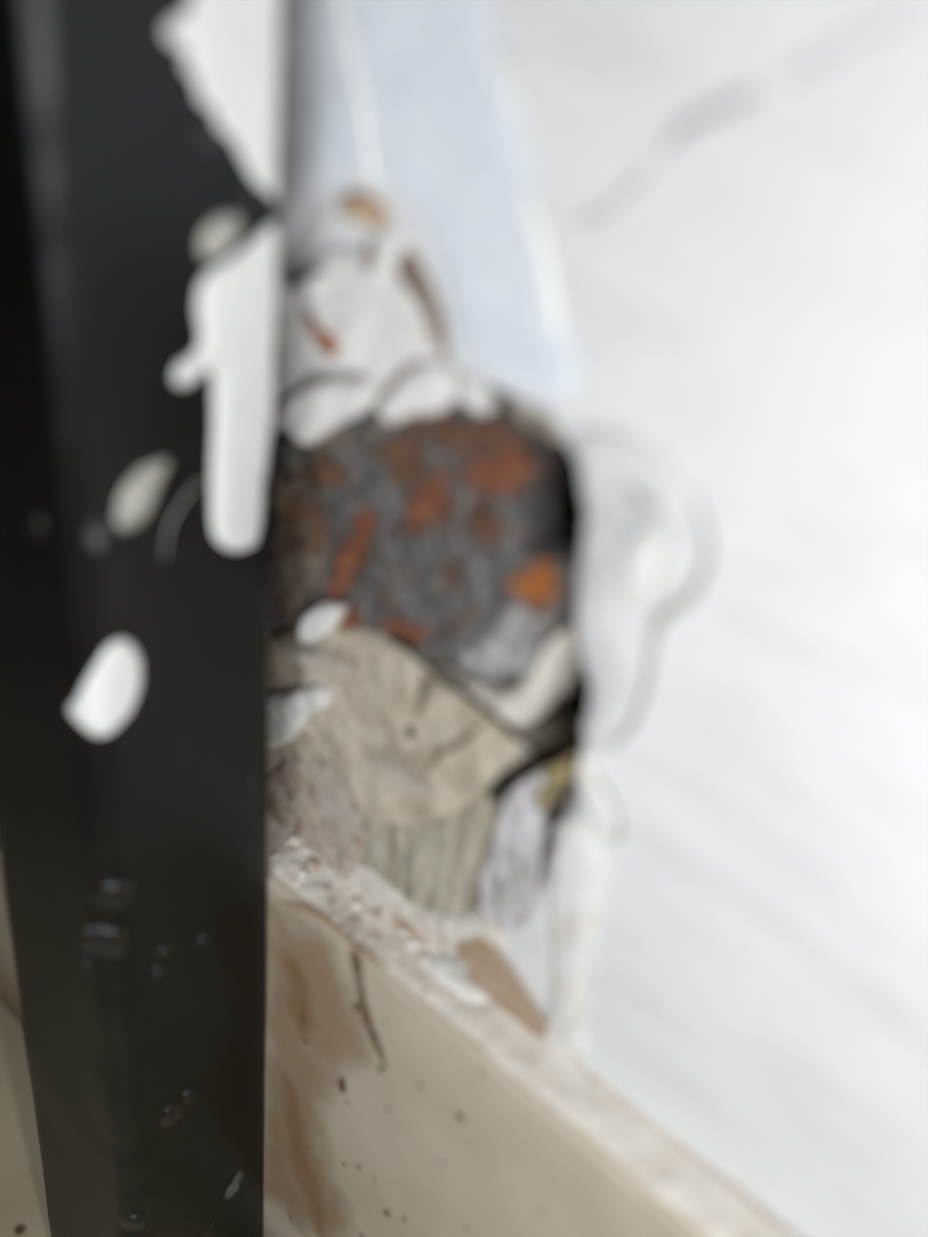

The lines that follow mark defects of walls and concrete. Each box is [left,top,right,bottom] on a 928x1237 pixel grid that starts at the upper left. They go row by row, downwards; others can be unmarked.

peeling [273,190,567,444]
rust [375,415,459,433]
rust [327,509,375,631]
rust [508,560,559,609]
hole [268,598,591,956]